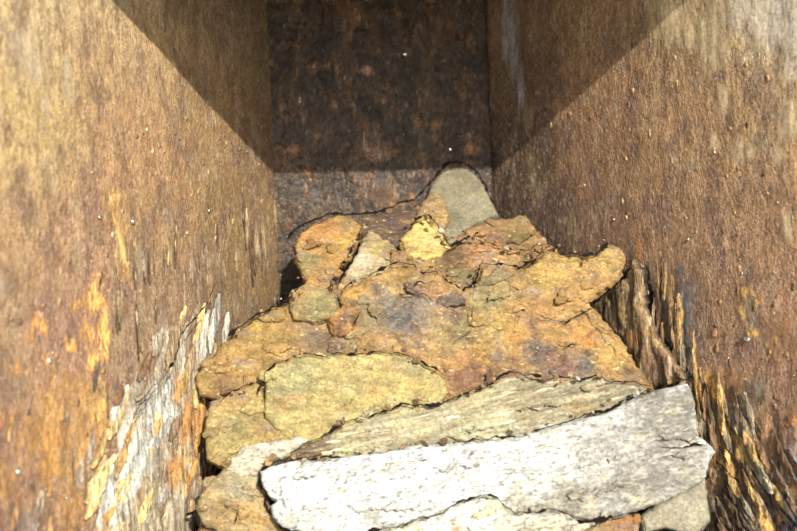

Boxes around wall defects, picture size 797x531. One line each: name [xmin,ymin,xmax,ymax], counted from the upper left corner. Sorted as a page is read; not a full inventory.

rust [733,285,795,357]
rust [0,187,277,531]
rust [697,359,749,406]
peeling [211,447,240,466]
rust [709,435,748,477]
rust [757,509,797,531]